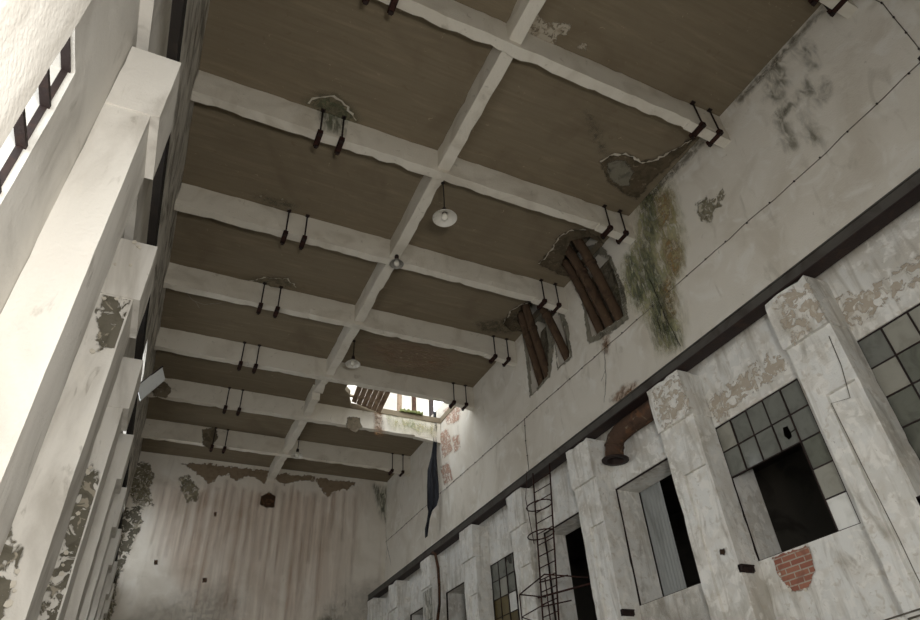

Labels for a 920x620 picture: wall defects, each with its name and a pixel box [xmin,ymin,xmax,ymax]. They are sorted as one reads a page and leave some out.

spalling [600,136,699,197]
peeling [90,295,131,354]
damp [628,239,680,346]
peeling [835,256,920,326]
peeling [652,375,690,429]
spalling [179,463,355,508]
peeling [0,527,24,620]
peeling [39,465,99,620]
peeling [104,462,154,620]
flaking render [772,545,815,592]